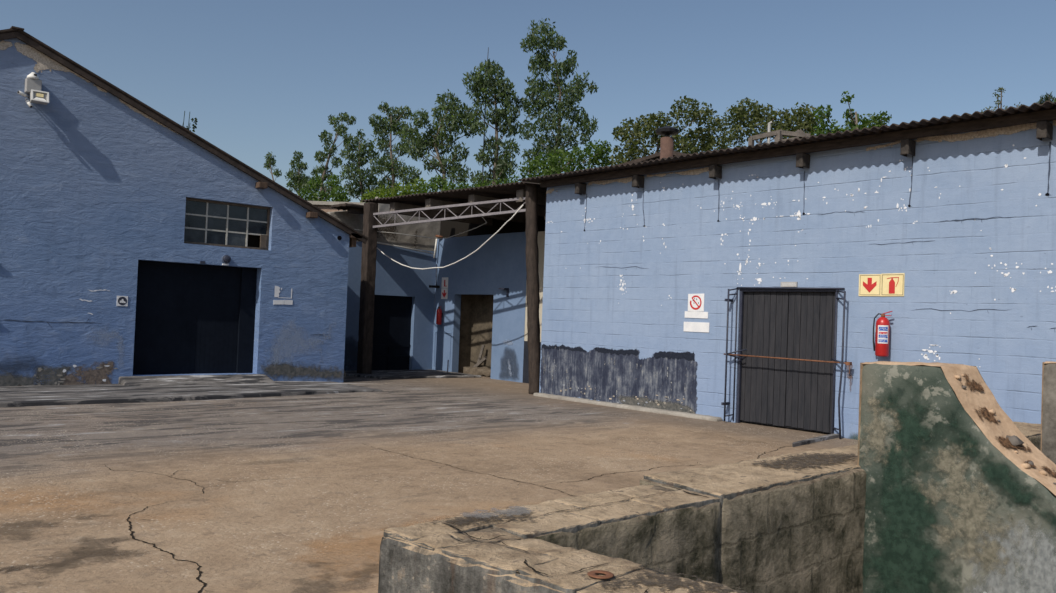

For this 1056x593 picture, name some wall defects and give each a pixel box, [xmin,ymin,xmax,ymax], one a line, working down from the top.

peeling [0,40,107,93]
peeling [714,191,810,286]
crack [878,216,1016,245]
spalling [0,361,118,386]
crack [112,503,207,593]
crack [362,443,709,577]
water stain [598,568,752,593]
water stain [752,394,1056,593]